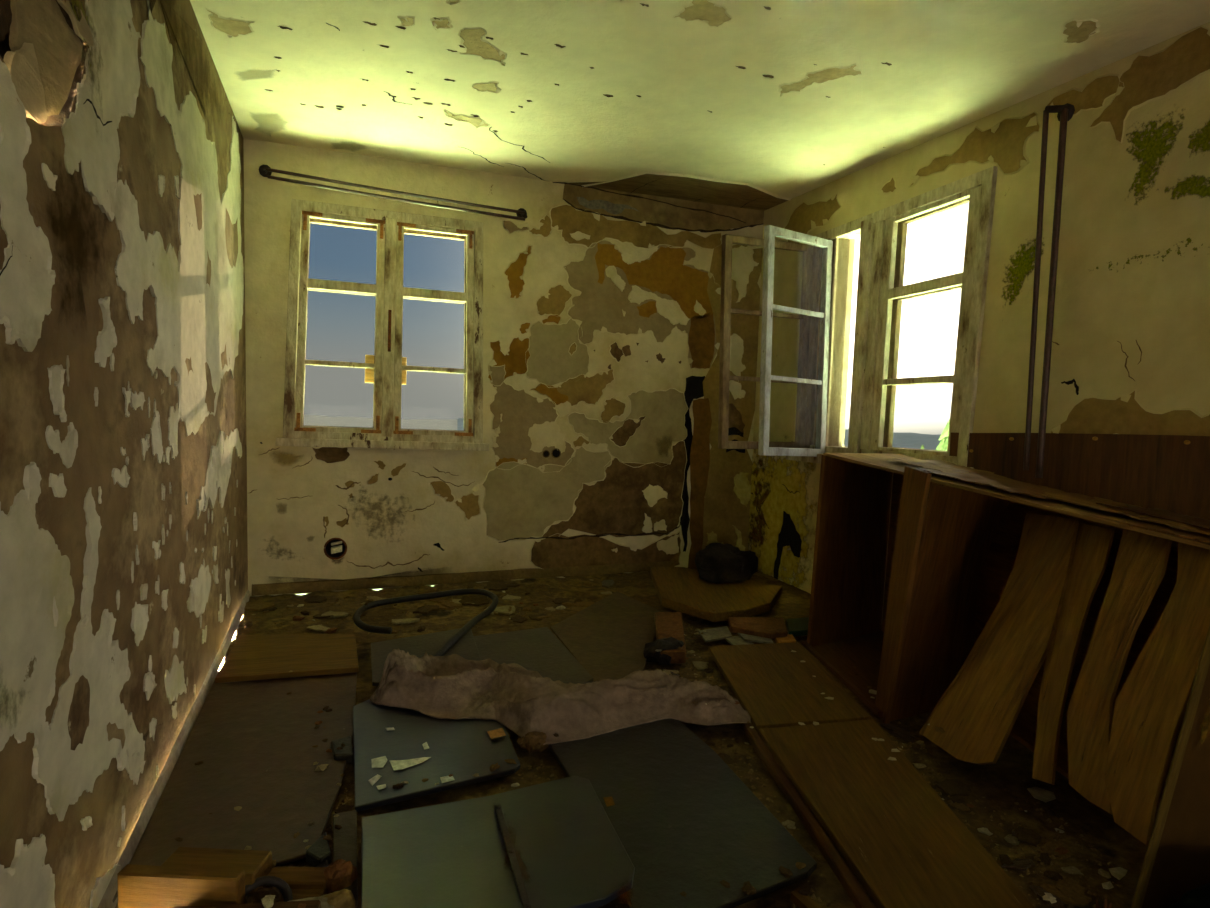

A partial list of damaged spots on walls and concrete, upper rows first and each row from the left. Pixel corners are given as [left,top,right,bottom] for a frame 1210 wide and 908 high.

peeling [205,7,255,38]
peeling [430,0,528,66]
peeling [673,0,733,27]
peeling [411,88,498,132]
peeling [472,81,502,93]
peeling [763,63,863,98]
peeling [881,26,1210,194]
leakage [1126,109,1210,205]
peeling [487,171,841,551]
peeling [0,0,244,821]
peeling [1050,389,1210,436]
peeling [0,834,55,908]